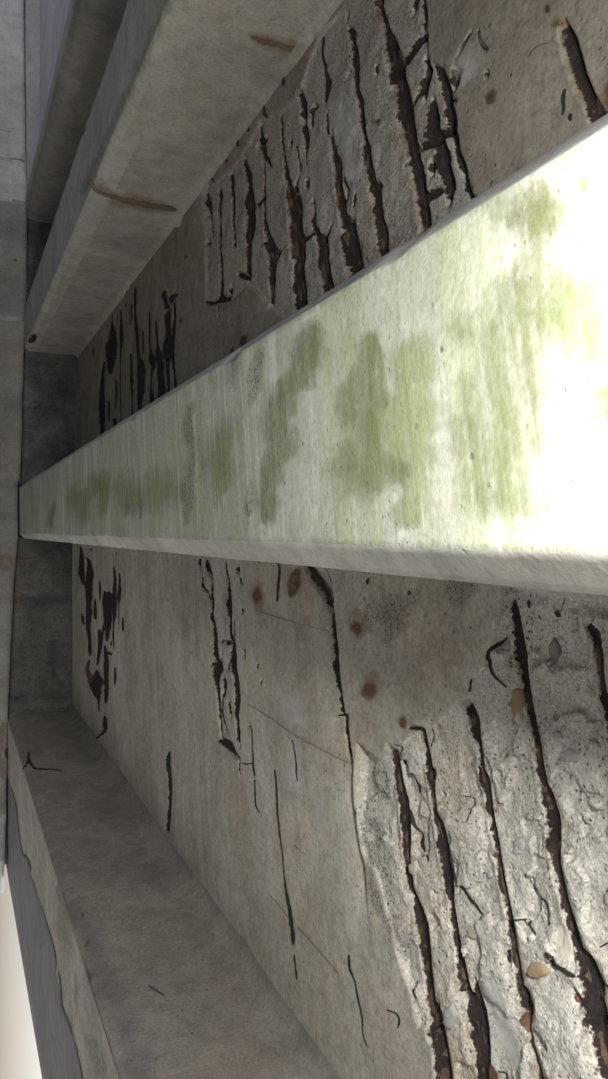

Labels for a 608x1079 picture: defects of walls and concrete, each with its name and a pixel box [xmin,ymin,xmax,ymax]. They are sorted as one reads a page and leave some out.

rust [88,180,177,211]
crack [299,37,332,190]
spalling [202,0,476,318]
rust [288,569,300,596]
crack [308,566,353,762]
rust [362,685,375,700]
peeling [7,722,119,1079]
crack [165,751,173,833]
crack [242,725,298,980]
crack [395,744,483,920]
spalling [356,586,608,1079]
crack [513,896,608,988]